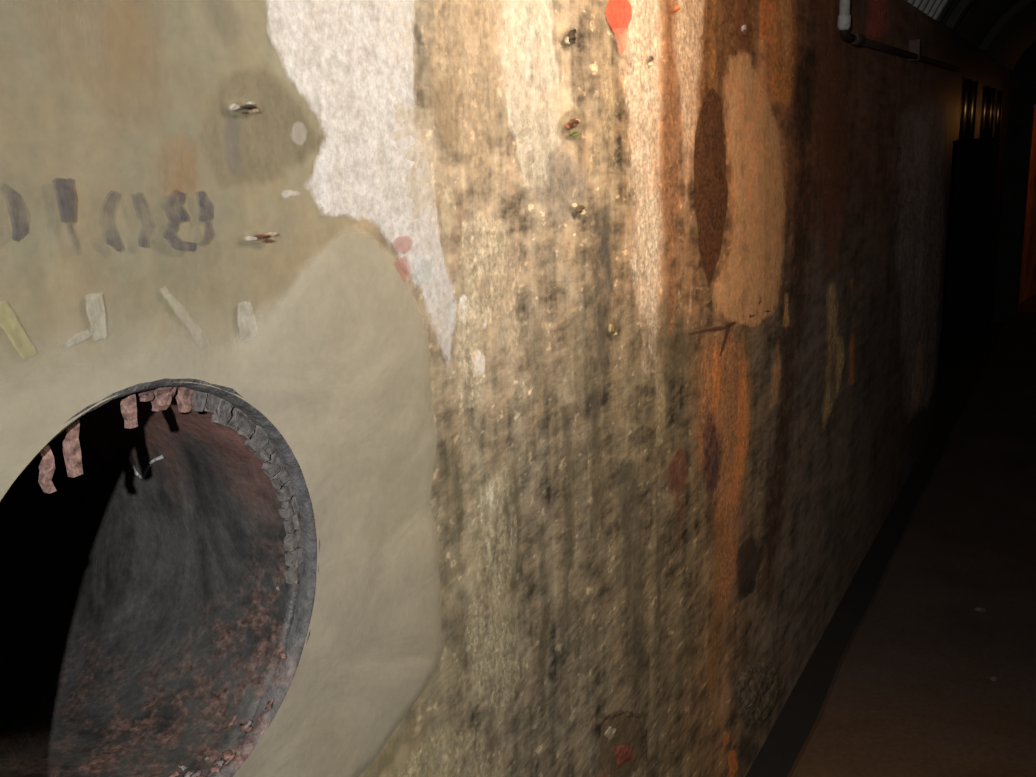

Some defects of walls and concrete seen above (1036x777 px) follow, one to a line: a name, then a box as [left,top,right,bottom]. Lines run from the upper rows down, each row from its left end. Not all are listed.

spalling [230,102,259,114]
spalling [245,233,277,242]
peeling [269,0,456,359]
water stain [434,0,501,178]
water stain [457,215,518,396]
water stain [532,150,582,214]
water stain [593,211,613,371]
water stain [627,0,661,318]
water stain [676,0,703,142]
rust [700,338,750,602]
water stain [458,469,520,706]
rust [168,750,236,777]